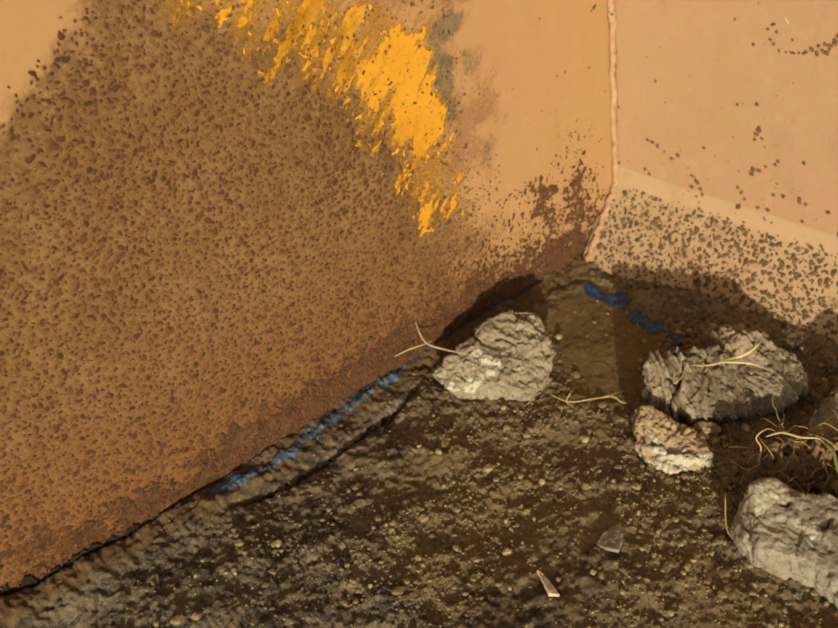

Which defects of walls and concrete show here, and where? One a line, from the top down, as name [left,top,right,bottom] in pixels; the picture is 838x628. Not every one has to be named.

leakage [275,0,396,99]
peeling [214,0,470,238]
leakage [358,0,495,207]
crack [234,388,417,507]